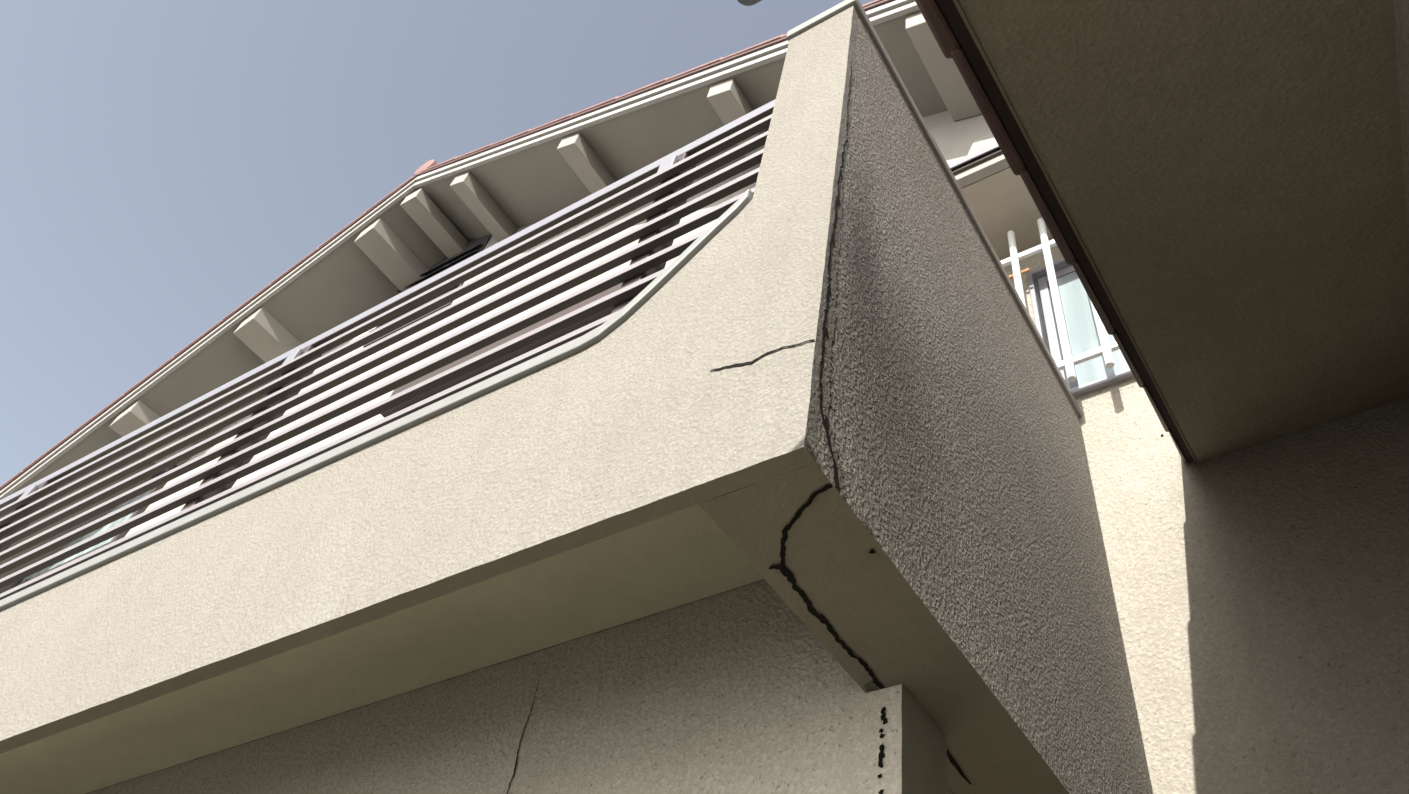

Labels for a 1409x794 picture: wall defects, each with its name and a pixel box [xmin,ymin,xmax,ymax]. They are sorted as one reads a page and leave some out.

crack [710,62,885,691]
crack [507,681,539,794]